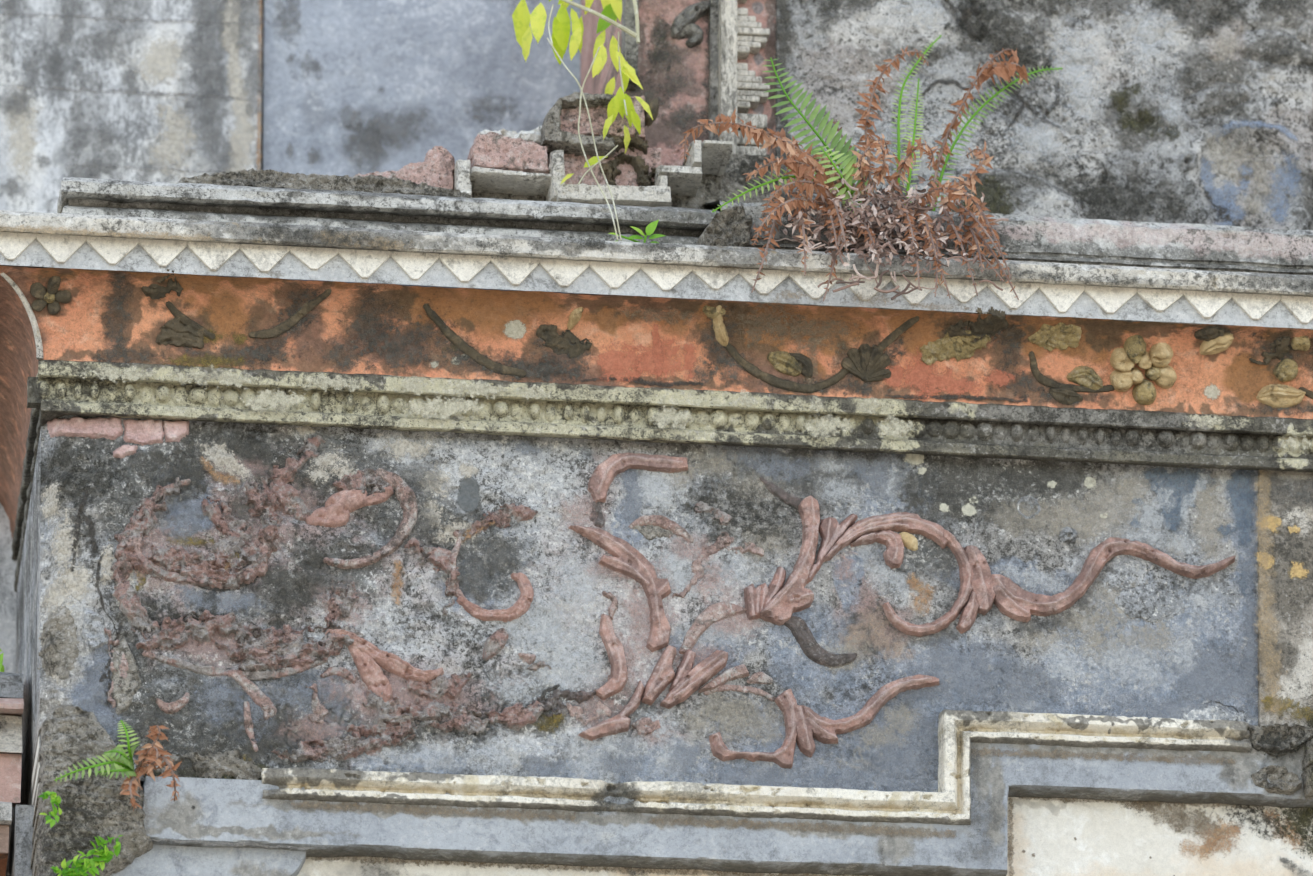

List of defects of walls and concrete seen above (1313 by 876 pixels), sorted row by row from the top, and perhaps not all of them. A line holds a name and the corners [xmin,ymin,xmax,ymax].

damp [0,0,263,197]
spalling [540,92,615,159]
damp [773,0,793,174]
damp [815,0,870,31]
damp [898,0,1098,117]
damp [1126,0,1201,89]
damp [1009,124,1189,220]
flaking render [47,416,252,484]
spalling [268,438,552,671]
flaking render [176,586,266,616]
spalling [602,591,618,620]
flaking render [194,669,349,743]